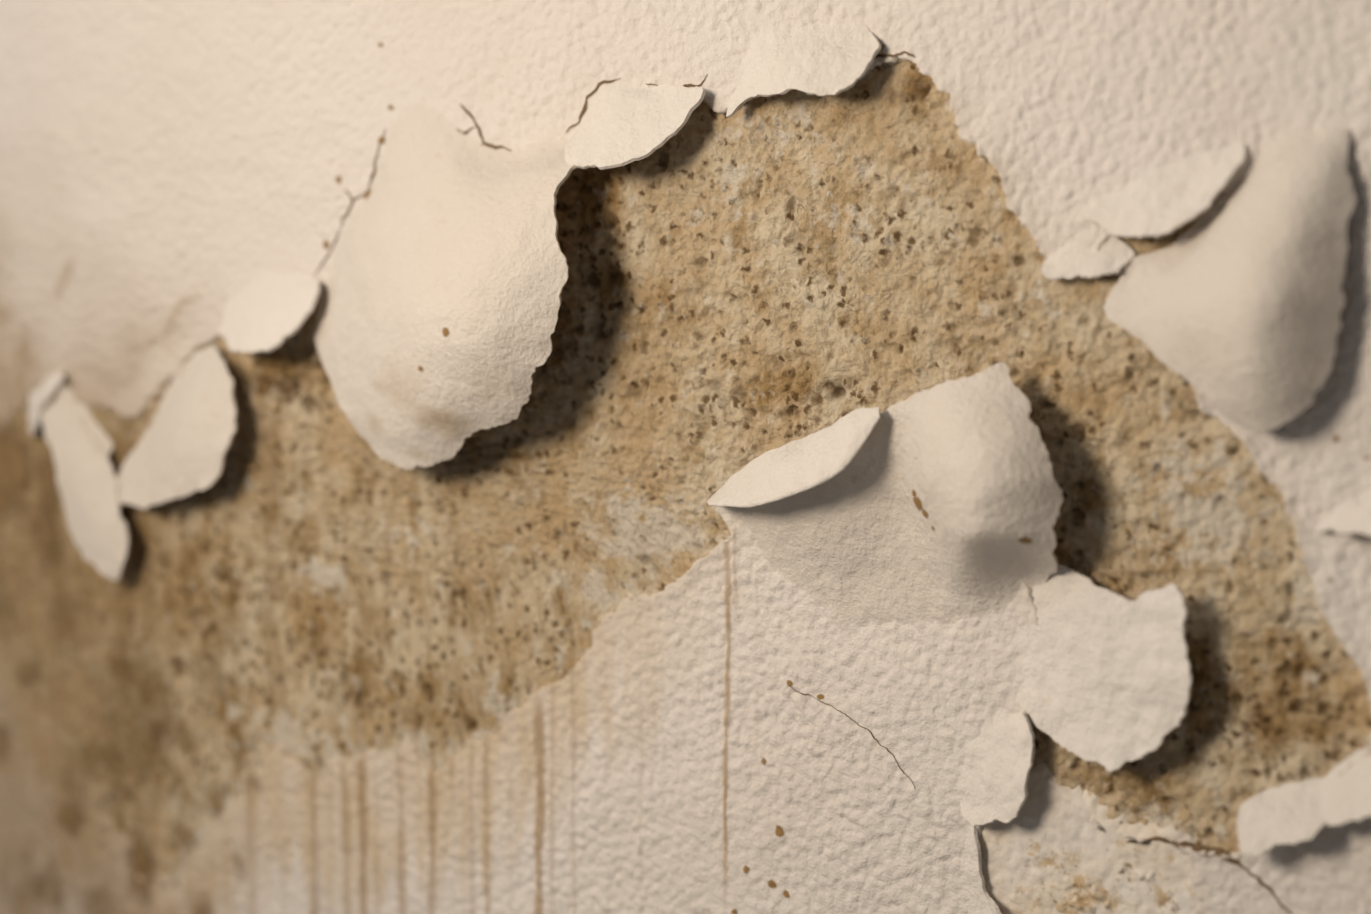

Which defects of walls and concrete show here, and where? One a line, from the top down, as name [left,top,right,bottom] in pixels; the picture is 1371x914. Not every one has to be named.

spalling [726,19,881,118]
spalling [1041,212,1204,280]
spalling [219,269,321,354]
damp [0,342,56,555]
spalling [83,381,172,477]
peeling [1315,488,1371,537]
spalling [1012,564,1193,773]
crack [790,686,915,788]
damp [534,714,543,914]
spalling [956,710,1199,914]
peeling [1237,747,1371,856]
crack [1126,836,1292,914]